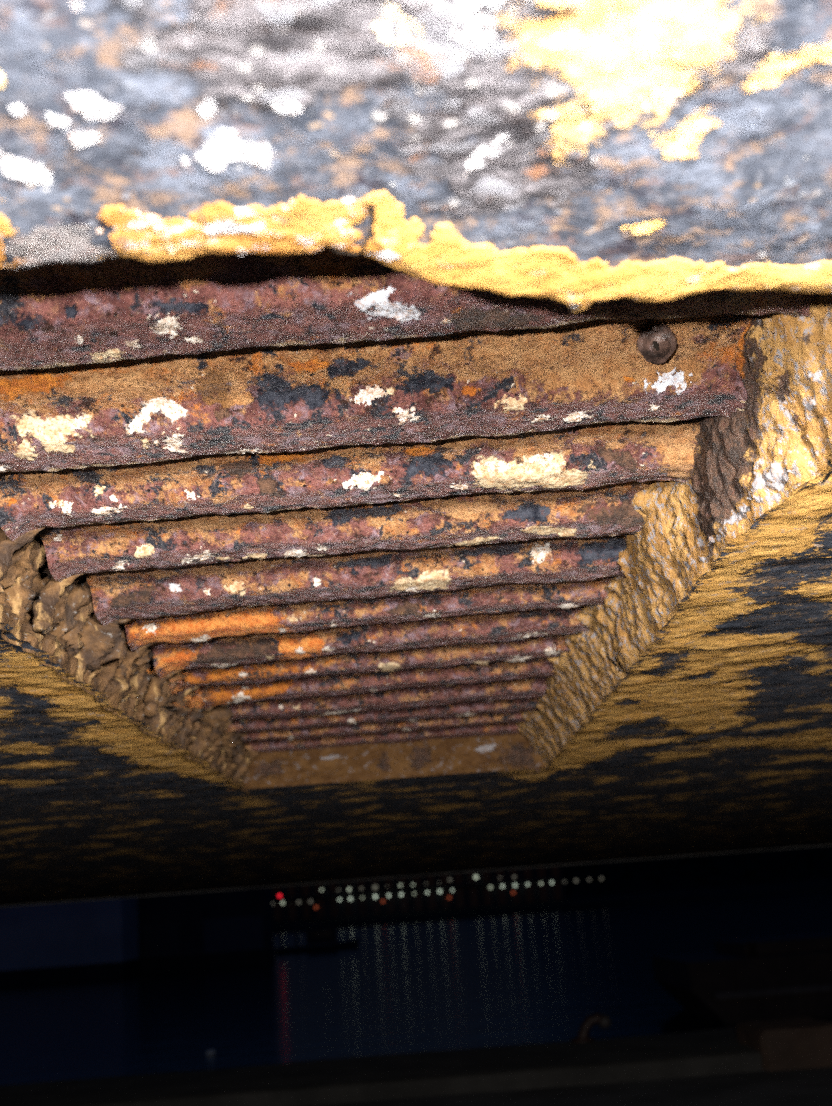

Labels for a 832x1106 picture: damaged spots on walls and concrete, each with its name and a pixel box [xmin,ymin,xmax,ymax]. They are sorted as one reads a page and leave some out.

spalling [91,0,832,313]
peeling [350,286,422,323]
rust [0,370,169,402]
rust [192,356,379,422]
rust [401,304,718,407]
peeling [0,409,94,472]
peeling [126,397,188,453]
peeling [447,450,595,491]
rust [597,315,772,557]
rust [422,494,551,525]
peeling [500,448,832,782]
rust [127,607,367,721]